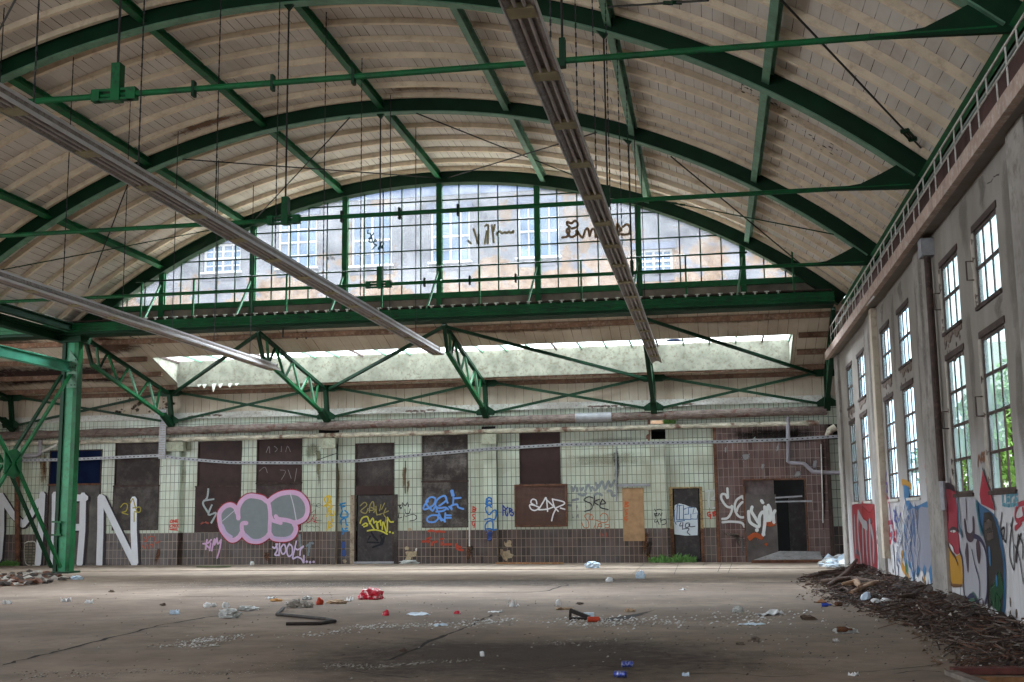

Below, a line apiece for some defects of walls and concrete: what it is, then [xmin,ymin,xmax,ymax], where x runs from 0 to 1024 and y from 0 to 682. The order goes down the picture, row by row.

crack [3,596,213,665]